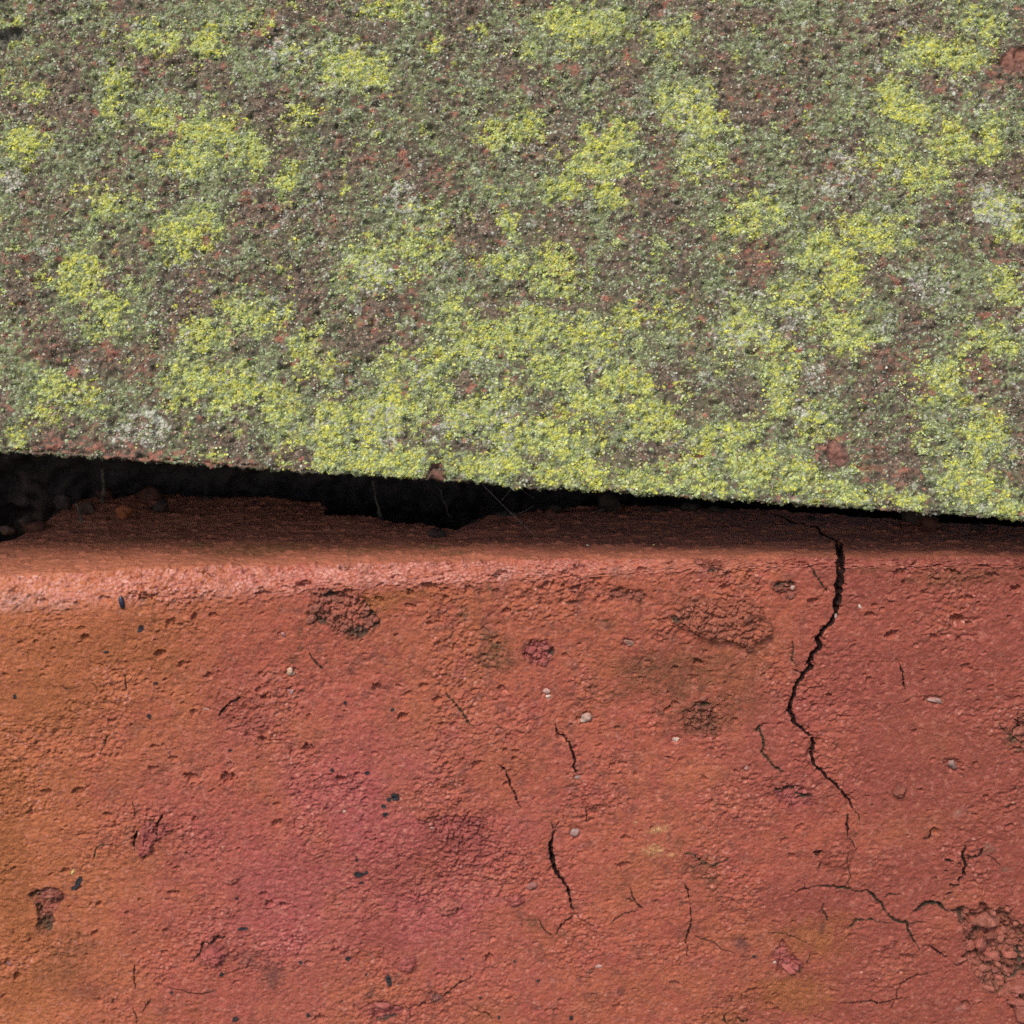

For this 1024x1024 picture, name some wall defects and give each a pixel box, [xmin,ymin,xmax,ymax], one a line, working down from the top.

spalling [305,590,380,641]
crack [555,724,578,772]
crack [756,725,783,772]
crack [776,515,1000,1008]
crack [538,822,643,935]
crack [767,932,811,963]
spalling [946,900,1024,1023]